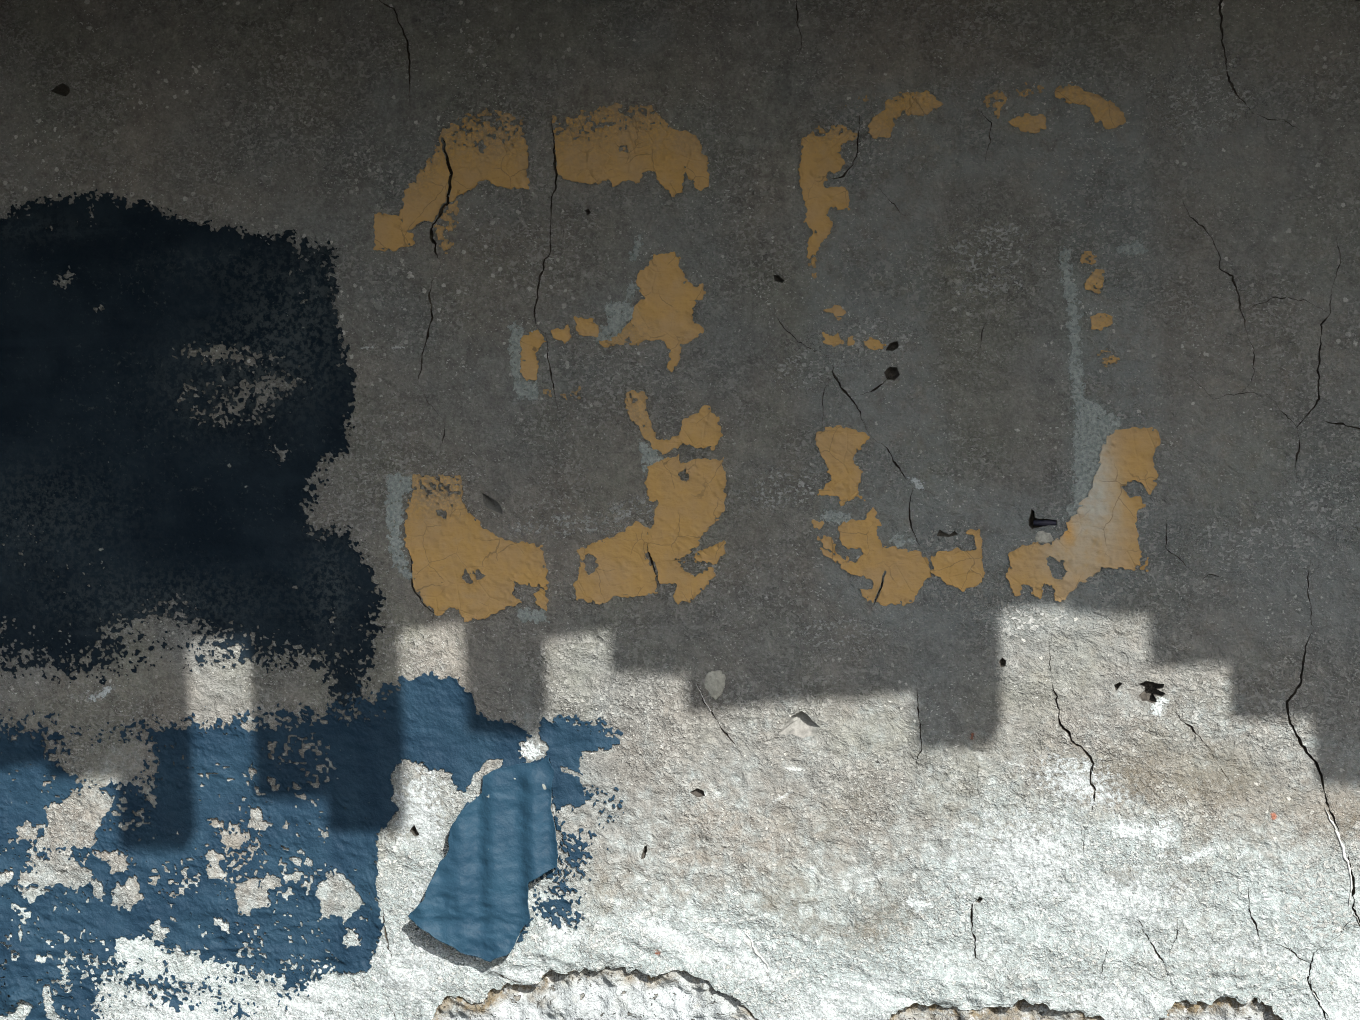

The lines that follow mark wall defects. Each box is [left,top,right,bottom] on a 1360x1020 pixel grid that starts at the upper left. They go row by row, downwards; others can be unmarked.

peeling [0,188,624,1020]
crack [413,140,453,453]
crack [534,120,558,409]
peeling [573,390,727,605]
crack [772,312,935,544]
peeling [811,425,985,606]
peeling [1006,427,1161,602]
crack [1183,203,1360,483]
crack [1049,645,1122,856]
crack [1248,560,1360,1020]
spalling [432,967,759,1020]
spalling [889,999,1105,1020]